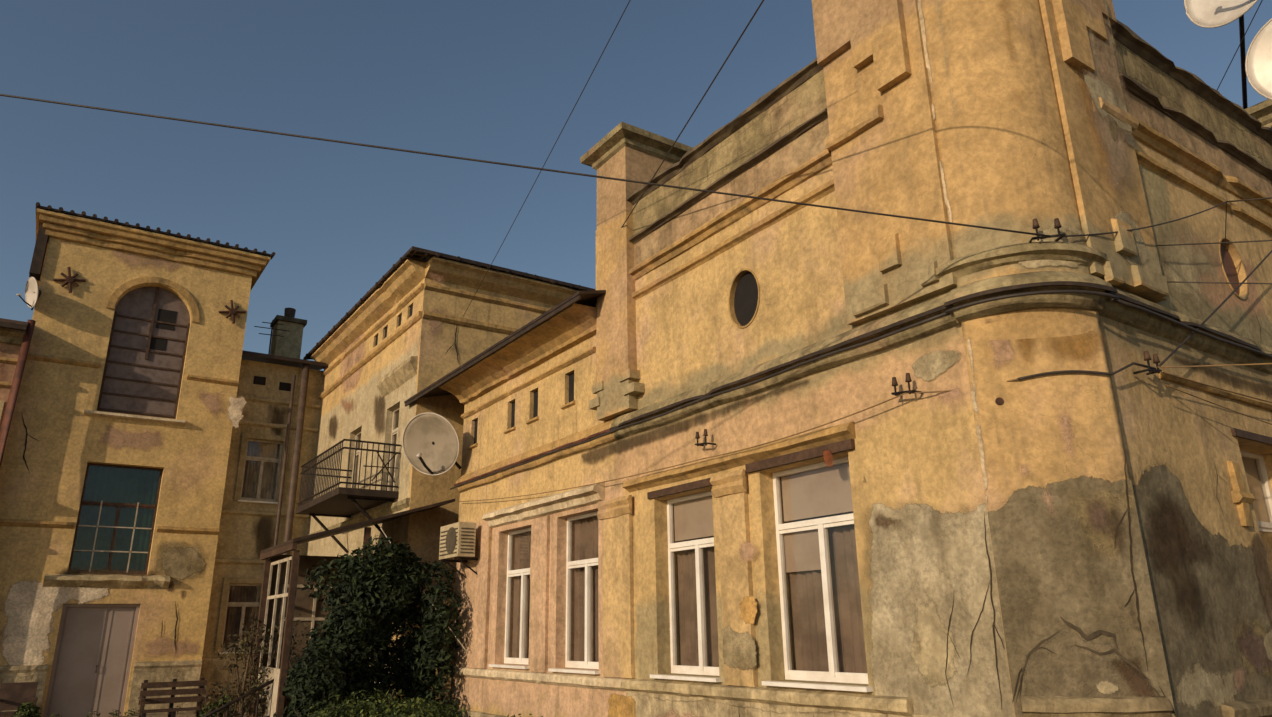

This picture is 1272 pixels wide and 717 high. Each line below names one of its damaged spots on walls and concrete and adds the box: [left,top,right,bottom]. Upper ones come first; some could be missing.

peeling [918,0,933,88]
peeling [939,161,952,227]
crack [21,412,37,473]
peeling [201,393,247,428]
spalling [865,339,1272,717]
spalling [155,542,206,591]
peeling [722,596,757,670]
crack [945,512,1024,709]